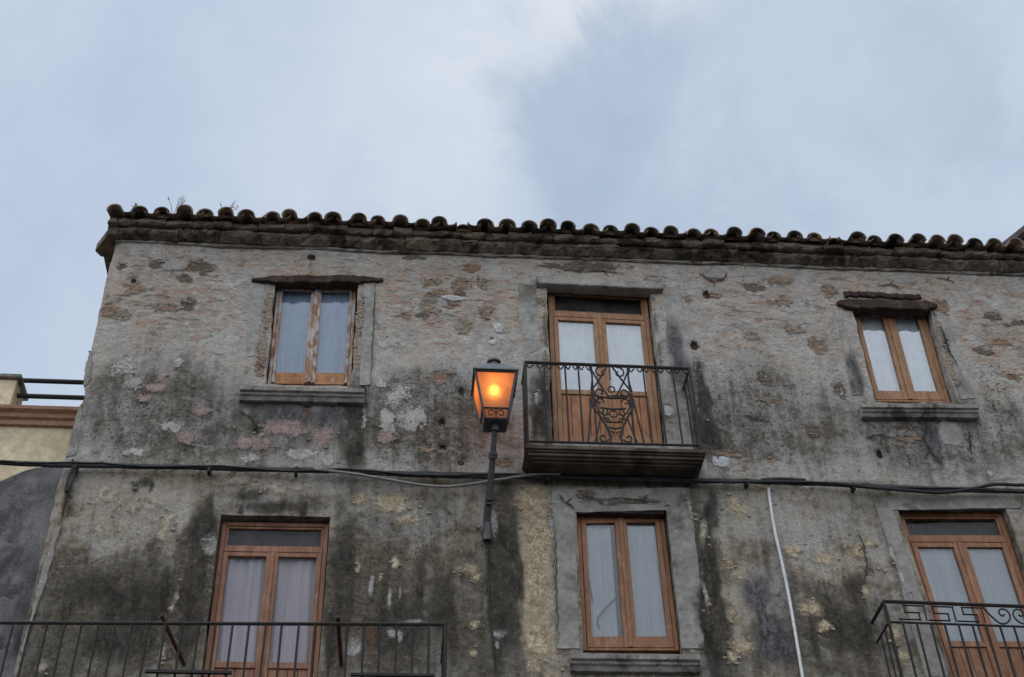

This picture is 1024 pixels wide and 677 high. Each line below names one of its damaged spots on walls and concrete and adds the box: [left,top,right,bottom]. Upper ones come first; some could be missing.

peeling [138,372,170,403]
peeling [236,420,340,450]
damp [667,324,722,448]
damp [705,492,718,526]
damp [180,498,215,658]
damp [489,527,524,662]
damp [695,538,725,677]
damp [744,580,795,667]